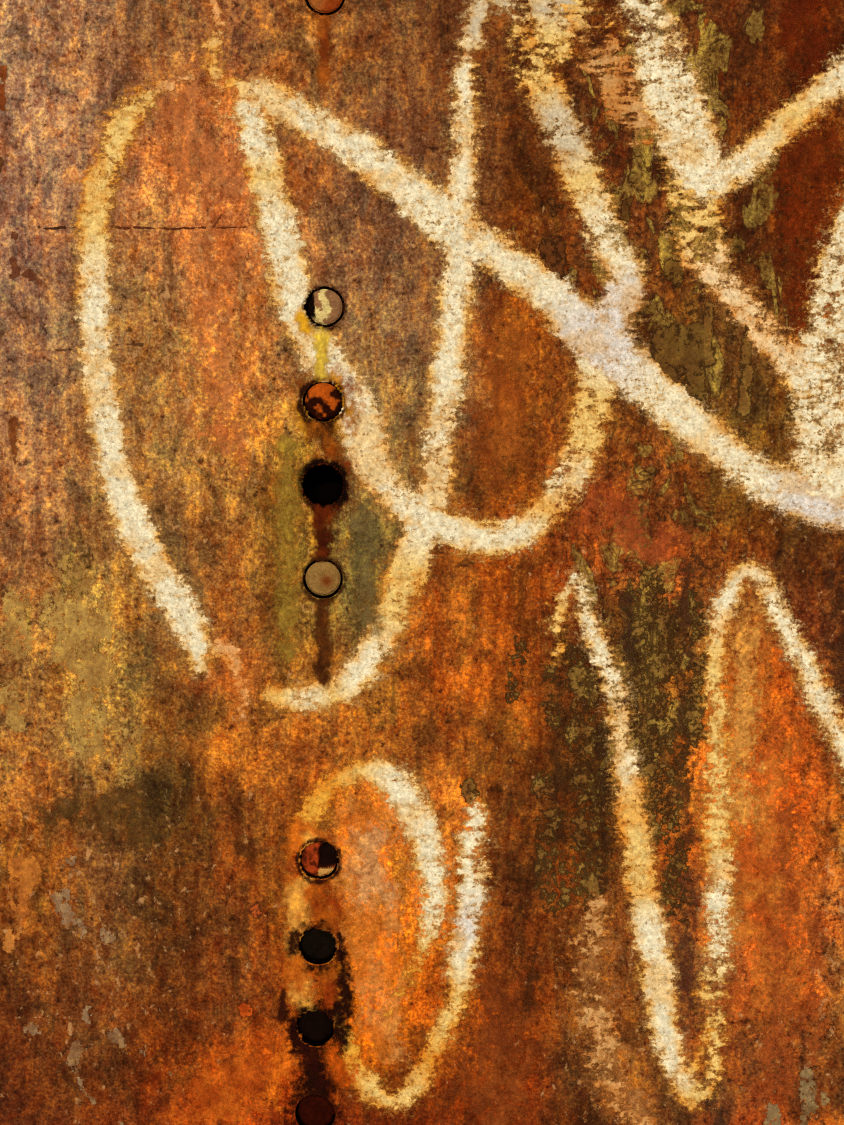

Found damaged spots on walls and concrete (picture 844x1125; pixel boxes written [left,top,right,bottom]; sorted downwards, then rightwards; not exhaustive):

rust [307,4,345,90]
rust [768,0,842,119]
rust [9,256,42,284]
rust [152,82,260,476]
rust [763,102,843,336]
rust [9,416,21,464]
rust [272,285,384,686]
rust [460,299,547,499]
rust [575,475,695,570]
rust [700,603,840,1111]
rust [161,790,417,1125]